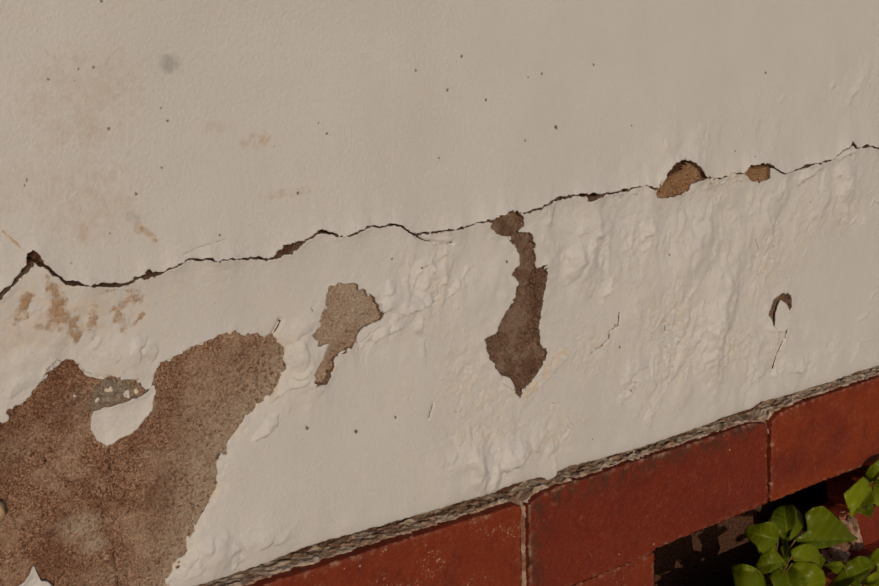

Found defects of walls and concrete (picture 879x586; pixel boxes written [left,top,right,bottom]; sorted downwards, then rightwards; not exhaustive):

crack [667,160,686,177]
peeling [650,157,709,198]
peeling [736,164,769,182]
crack [21,251,117,285]
crack [254,242,296,259]
peeling [484,211,569,398]
peeling [769,293,790,332]
peeling [311,283,382,383]
peeling [0,330,285,586]